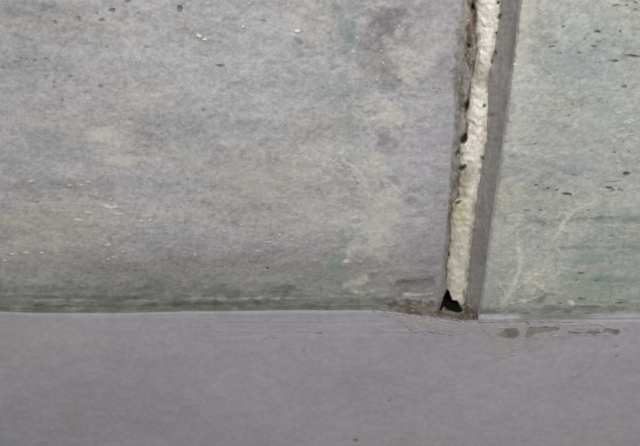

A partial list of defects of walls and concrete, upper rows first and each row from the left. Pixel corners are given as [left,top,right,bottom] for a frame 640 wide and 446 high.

damp [0,0,437,312]
spalling [378,289,478,323]
peeling [497,325,560,341]
peeling [567,327,623,337]